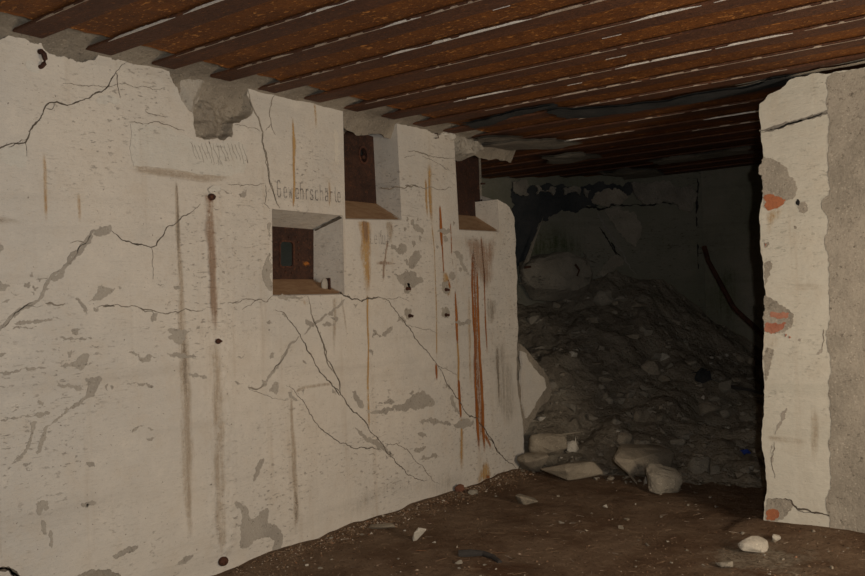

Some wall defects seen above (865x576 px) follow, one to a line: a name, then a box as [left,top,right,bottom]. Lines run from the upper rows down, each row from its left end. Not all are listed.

crack [0,62,165,151]
spalling [179,79,253,141]
crack [759,110,828,133]
spalling [758,157,808,213]
crack [0,206,199,331]
rust [208,200,217,316]
rust [425,170,496,459]
spalling [763,296,802,341]
spalling [782,58,865,533]
crack [96,292,515,484]
spalling [234,501,283,550]
crack [0,566,20,576]